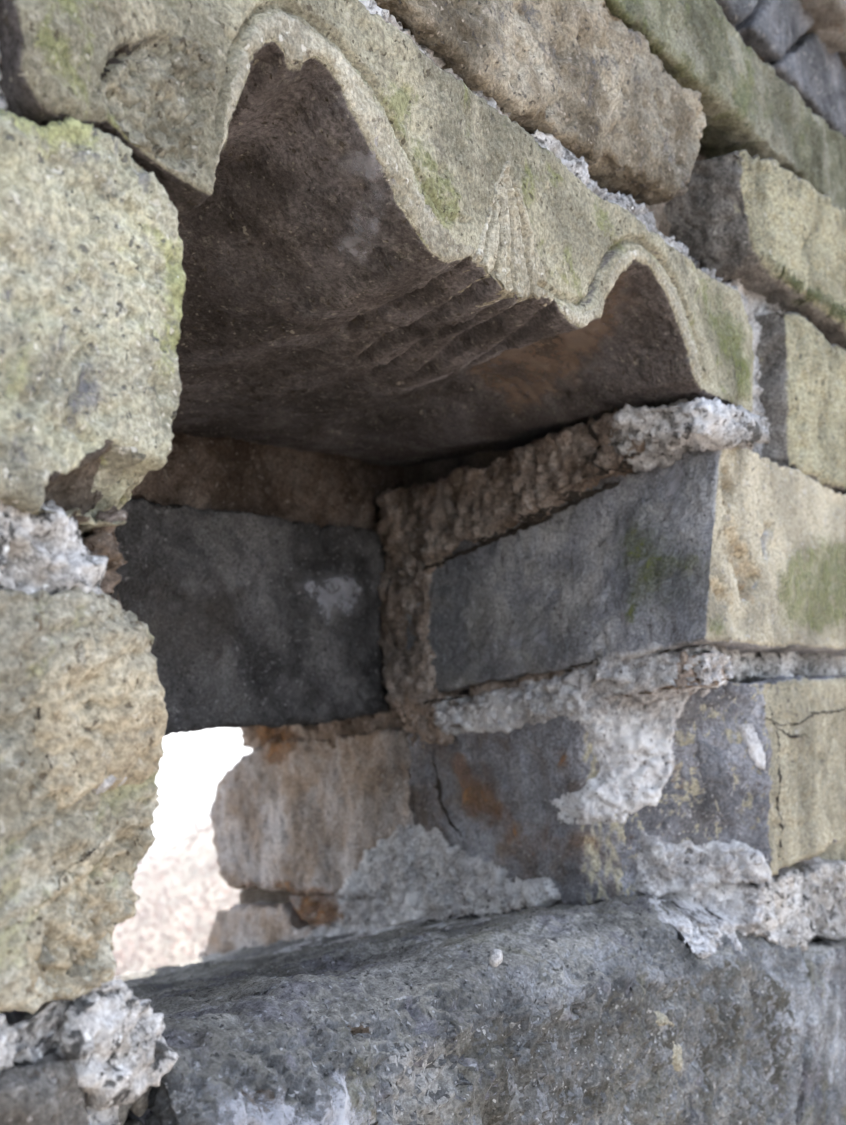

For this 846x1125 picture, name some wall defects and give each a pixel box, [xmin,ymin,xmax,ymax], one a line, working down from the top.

crack [766,701,846,858]